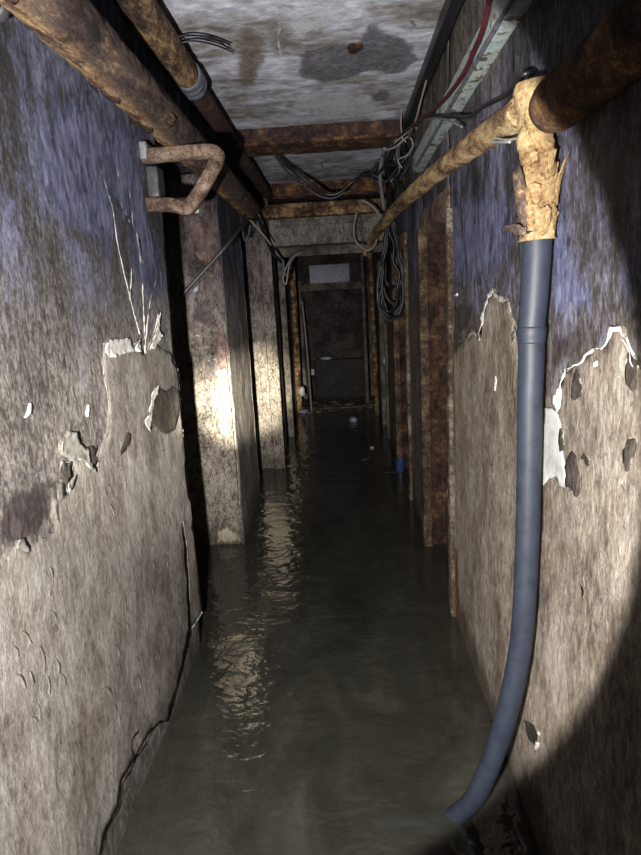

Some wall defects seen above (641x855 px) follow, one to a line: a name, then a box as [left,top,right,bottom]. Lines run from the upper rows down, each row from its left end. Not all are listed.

damp [300,25,416,82]
peeling [0,312,223,855]
crack [101,521,203,855]
peeling [446,288,518,718]
peeling [506,325,641,855]